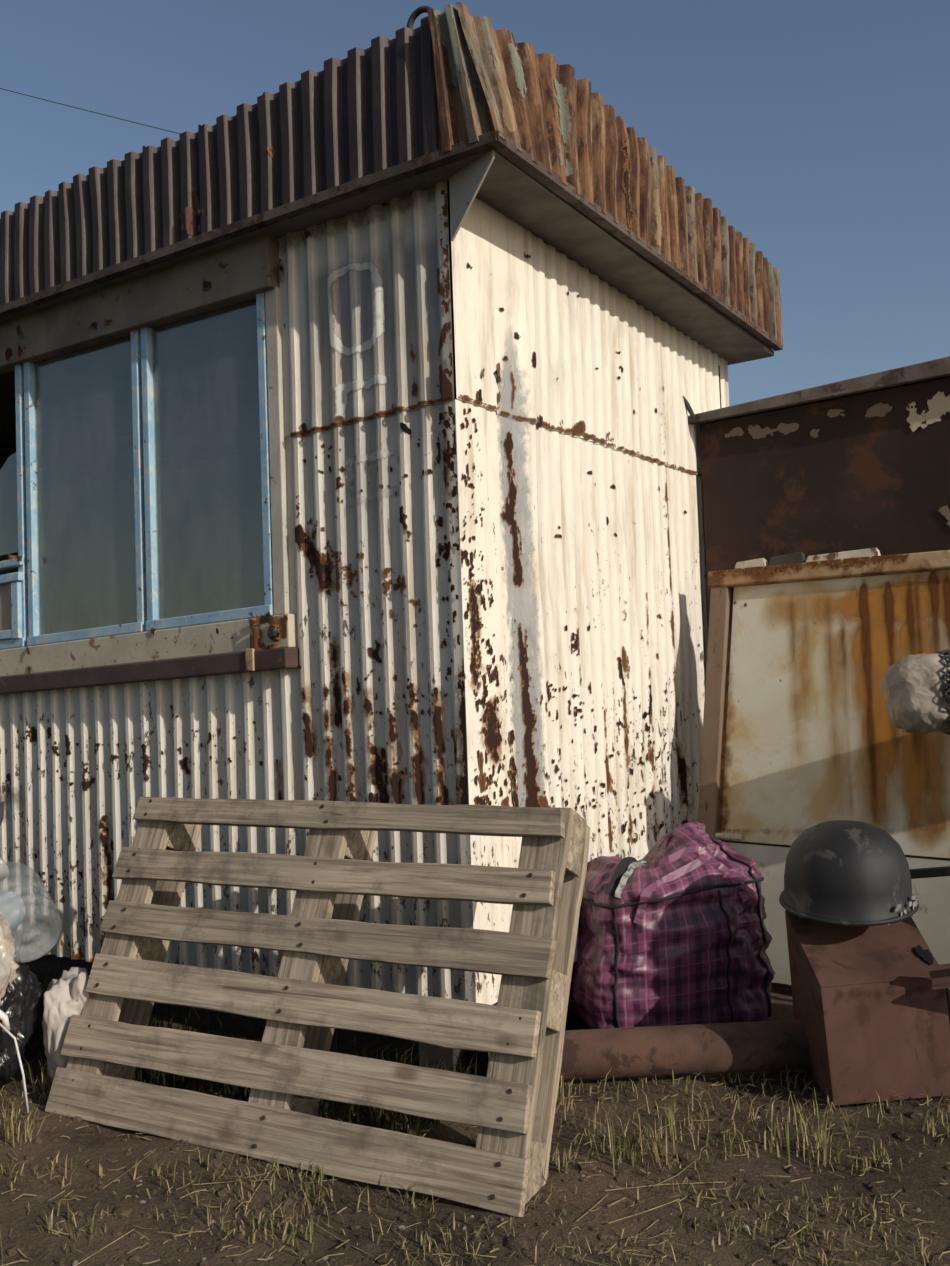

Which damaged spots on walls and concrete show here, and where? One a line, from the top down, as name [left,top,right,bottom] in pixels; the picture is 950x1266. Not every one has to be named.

corrosion [497,81,516,133]
peeling [723,423,820,439]
peeling [827,408,847,418]
peeling [864,391,950,432]
corrosion [290,188,702,852]
peeling [933,505,950,527]
corrosion [248,612,288,651]
corrosion [715,553,950,842]
corrosion [17,726,217,793]
corrosion [228,718,283,800]
corrosion [24,815,114,962]